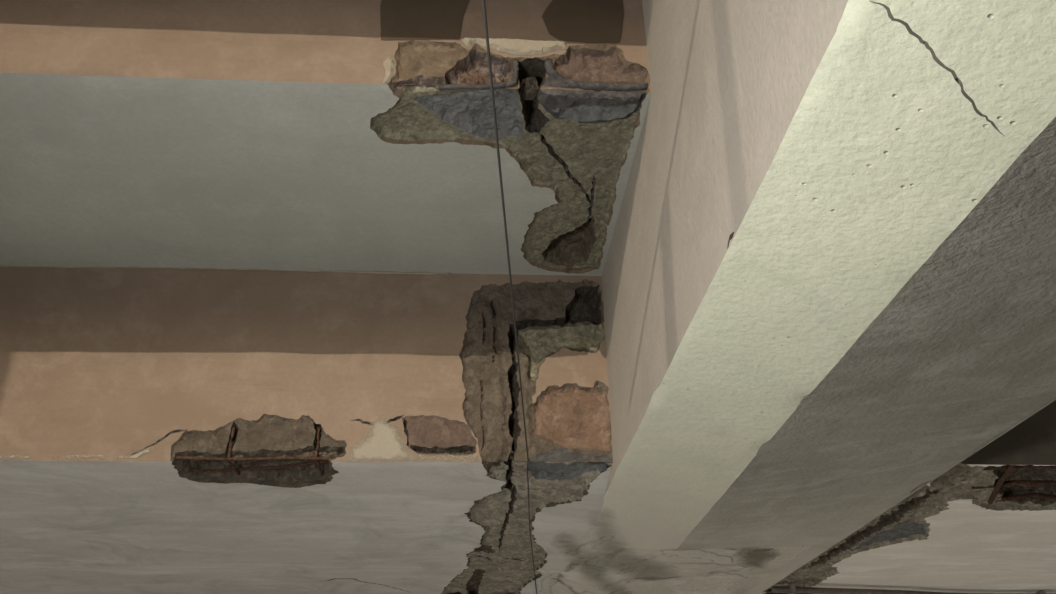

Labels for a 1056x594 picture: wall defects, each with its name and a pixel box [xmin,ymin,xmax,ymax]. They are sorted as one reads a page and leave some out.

crack [869,0,1003,135]
spalling [370,40,650,594]
spalling [170,414,347,488]
spalling [762,463,1056,594]